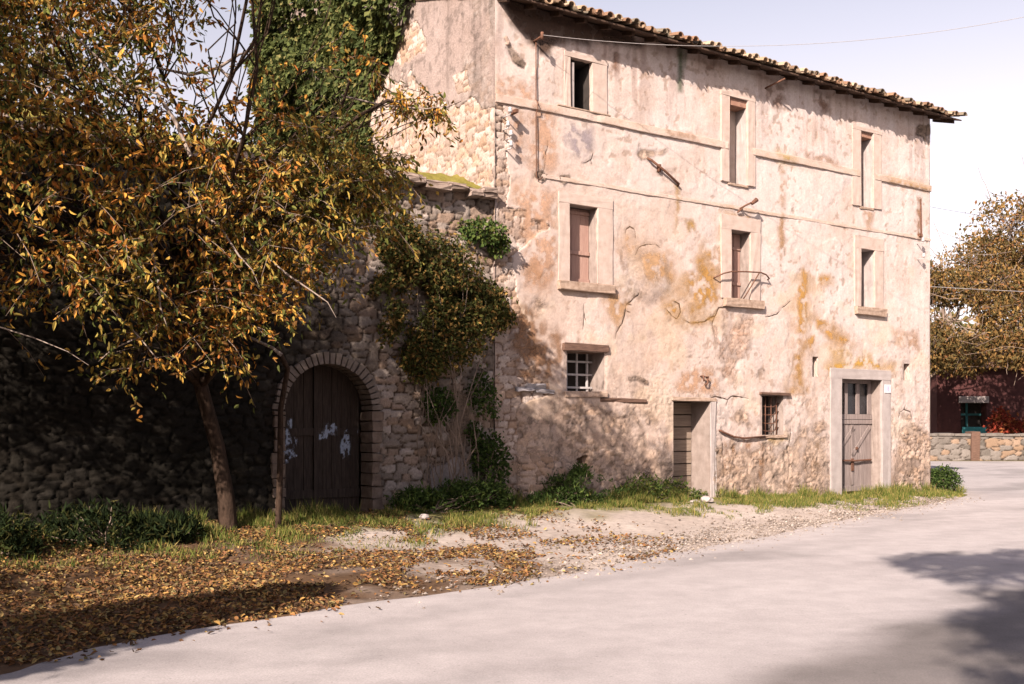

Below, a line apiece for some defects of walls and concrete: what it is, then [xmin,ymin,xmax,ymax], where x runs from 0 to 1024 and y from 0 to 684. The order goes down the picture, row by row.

flaking render [360,20,549,503]
damp [643,253,672,279]
damp [608,295,625,323]
crack [667,301,725,332]
damp [808,319,847,347]
flaking render [734,409,748,423]
flaking render [713,420,828,498]
flaking render [895,414,931,492]